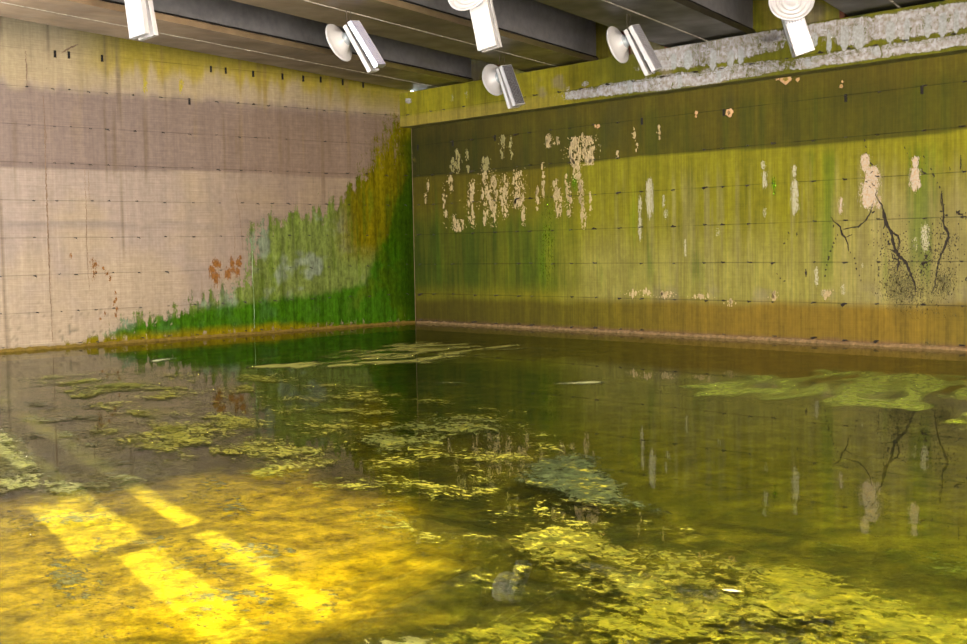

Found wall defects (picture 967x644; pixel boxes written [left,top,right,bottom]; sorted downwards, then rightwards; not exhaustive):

peeling [442,124,601,232]
corrosion [208,255,242,288]
crack [776,139,967,307]
leakage [872,254,958,319]
leakage [912,225,931,253]